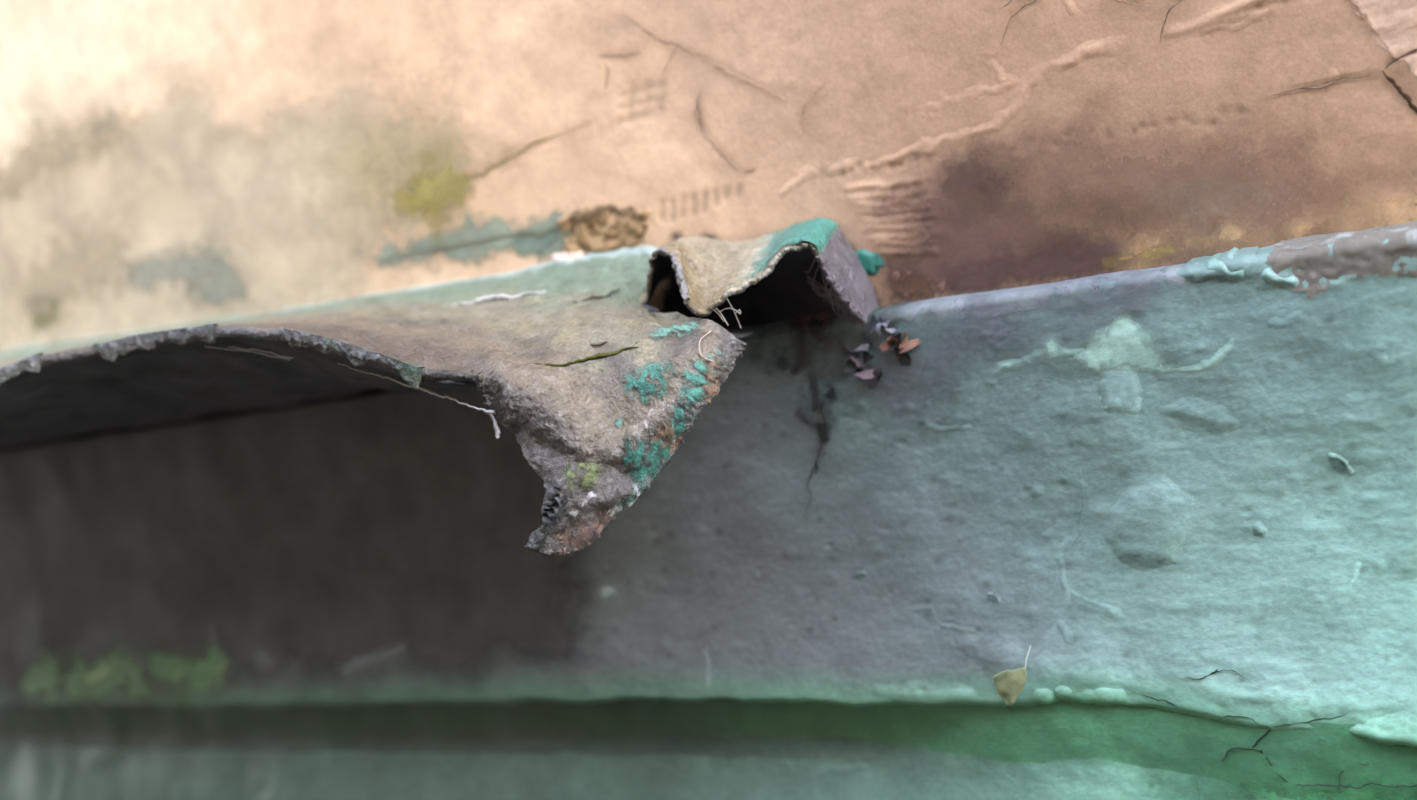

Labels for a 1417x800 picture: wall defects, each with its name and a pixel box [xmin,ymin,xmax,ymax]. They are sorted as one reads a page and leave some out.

crack [1266,0,1417,114]
damp [0,82,471,352]
damp [983,115,1417,270]
spalling [1265,220,1417,298]
peeling [0,205,767,701]
crack [1139,669,1347,727]